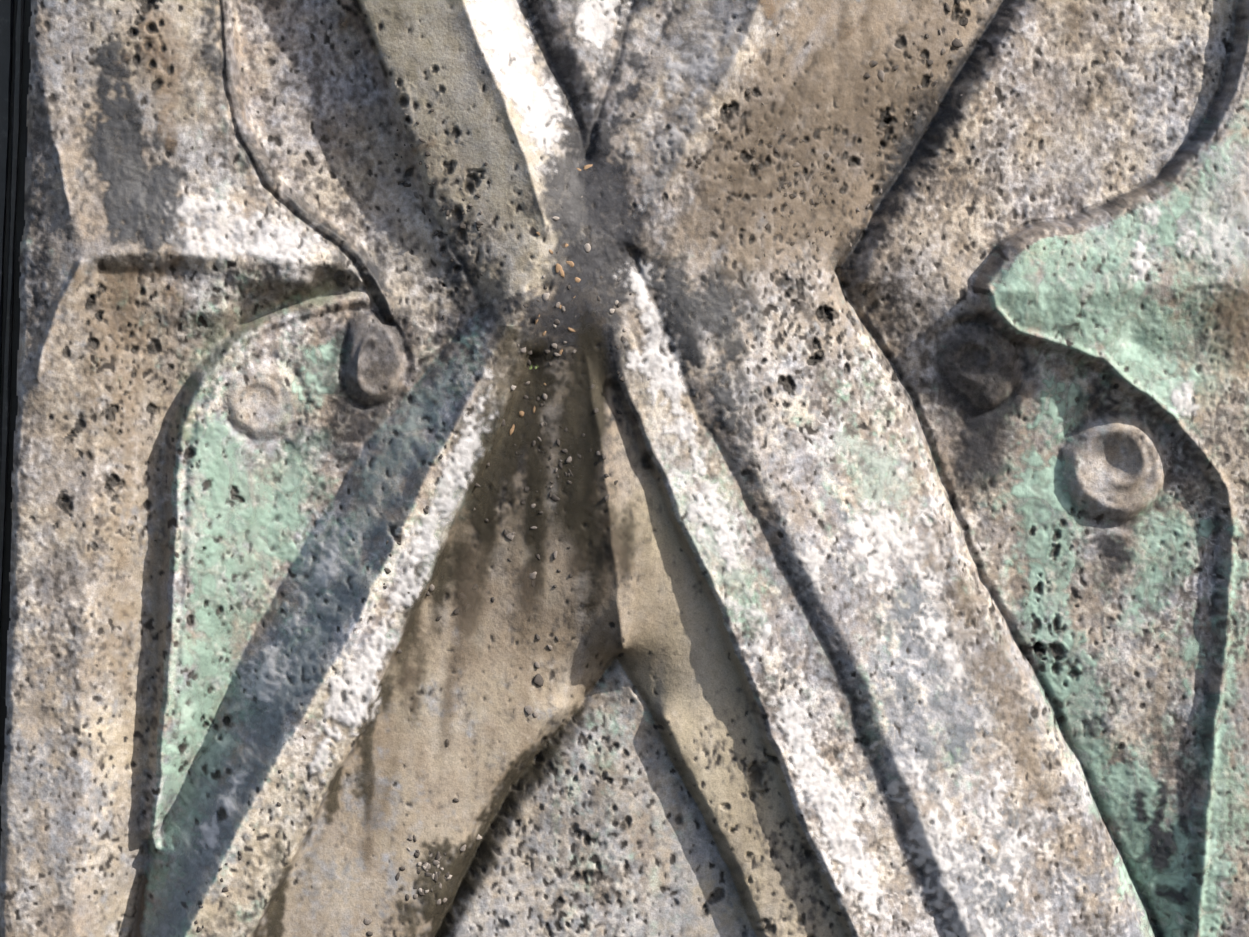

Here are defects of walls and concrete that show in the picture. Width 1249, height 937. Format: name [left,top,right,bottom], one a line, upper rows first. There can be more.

leakage [838,0,1007,274]
leakage [325,0,762,823]
leakage [864,456,908,503]
leakage [869,322,919,407]
leakage [397,706,585,937]